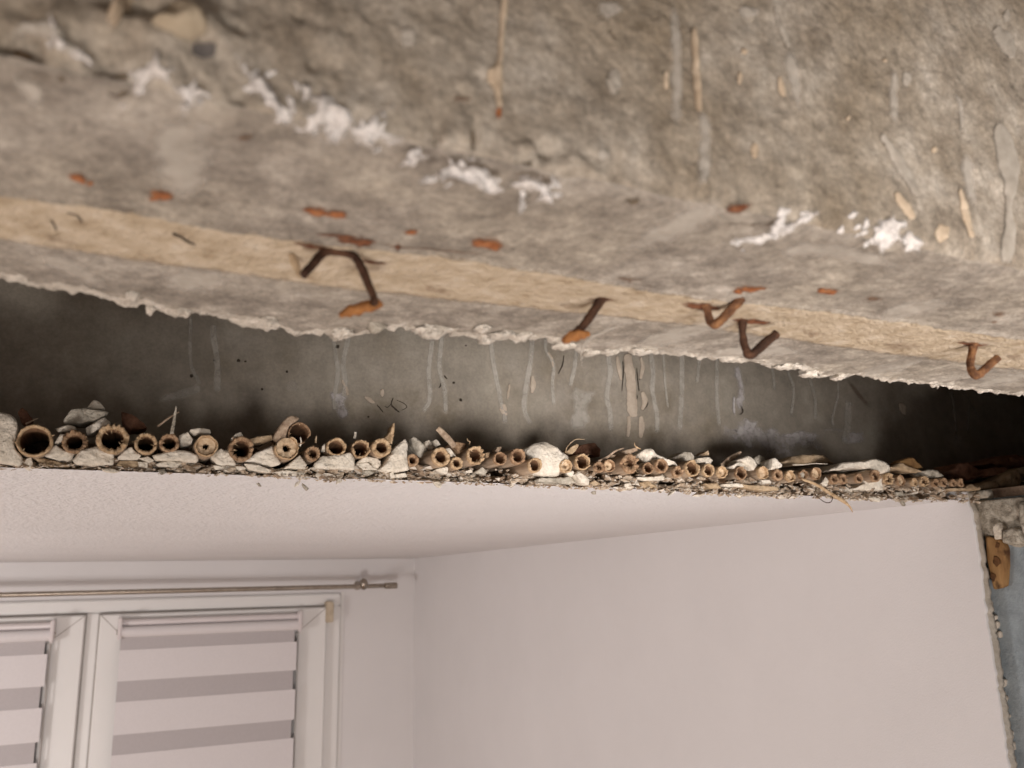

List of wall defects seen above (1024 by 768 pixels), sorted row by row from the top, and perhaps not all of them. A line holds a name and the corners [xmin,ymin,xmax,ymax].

water stain [238,57,403,153]
water stain [400,147,428,166]
water stain [421,158,562,213]
rust [303,208,346,219]
rust [296,234,373,249]
rust [473,240,503,251]
water stain [731,207,818,252]
water stain [787,211,923,264]
rust [338,299,383,318]
rust [561,330,590,344]
water stain [713,345,793,357]
peeling [616,353,648,438]